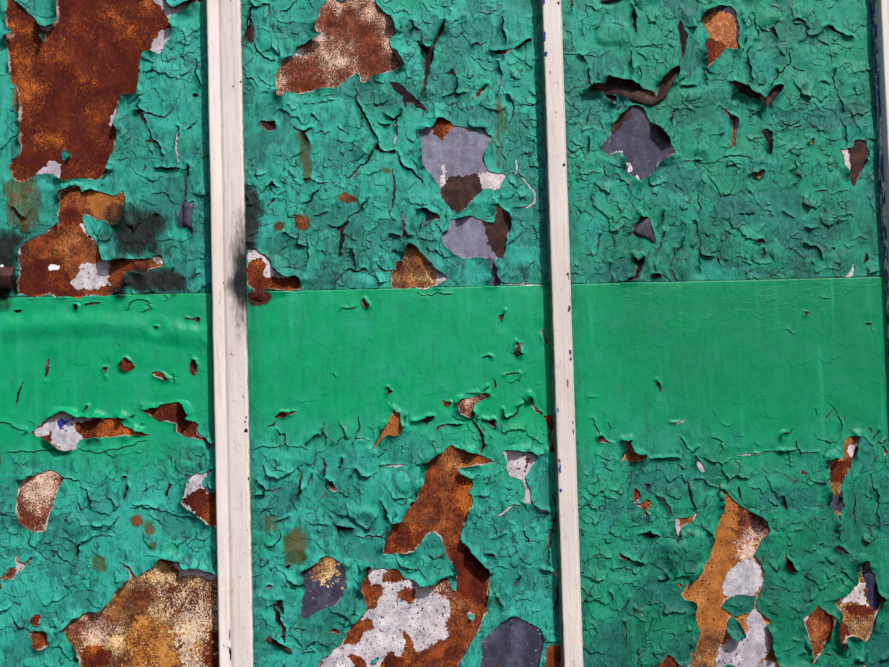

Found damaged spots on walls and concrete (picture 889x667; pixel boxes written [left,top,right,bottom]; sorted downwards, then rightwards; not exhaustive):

rust [1,0,206,302]
crack [242,0,303,65]
crack [280,0,471,294]
peeling [386,78,515,291]
crack [469,9,540,127]
peeling [584,16,705,184]
peeling [28,398,215,455]
rust [59,515,219,667]
peeling [161,465,216,532]
rust [314,441,499,667]
crack [583,415,822,526]
rust [655,485,784,667]